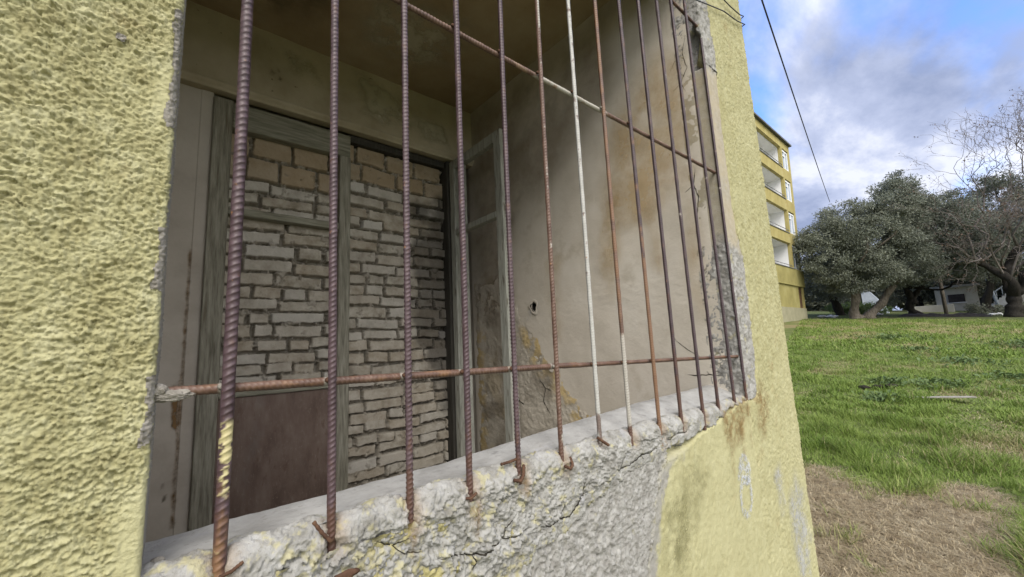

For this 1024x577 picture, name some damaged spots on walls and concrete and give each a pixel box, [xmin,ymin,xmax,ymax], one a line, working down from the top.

spalling [141,0,757,577]
corrosion [172,400,181,429]
crack [375,429,689,570]